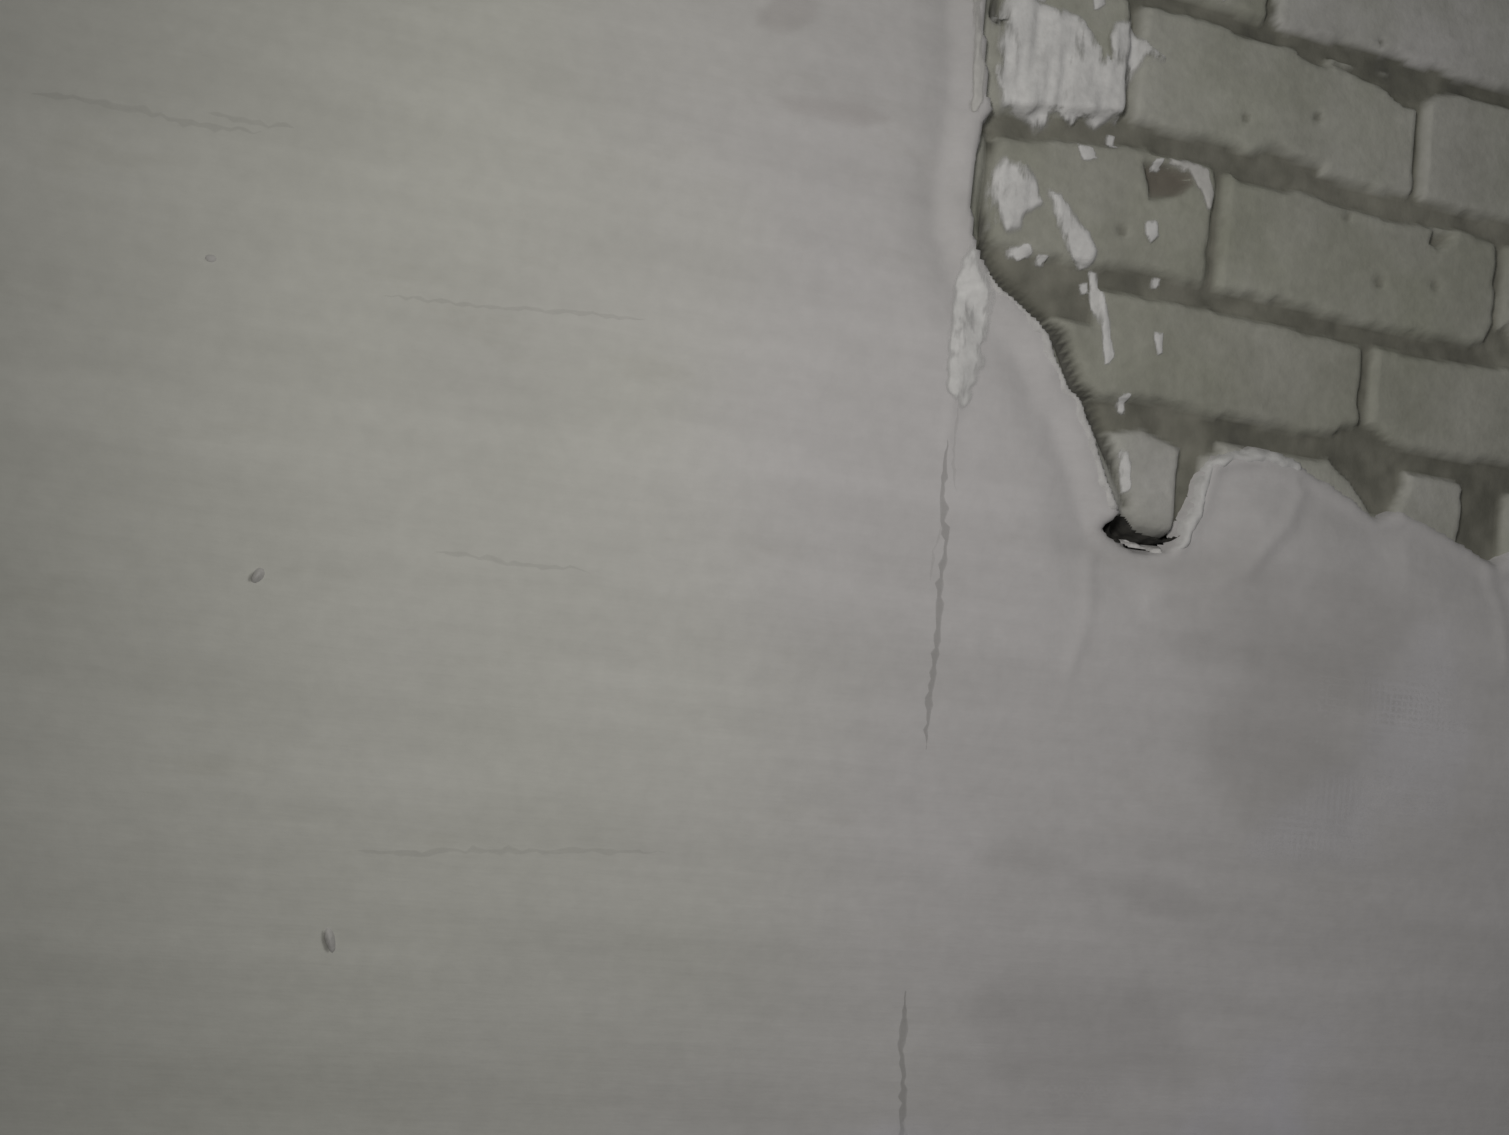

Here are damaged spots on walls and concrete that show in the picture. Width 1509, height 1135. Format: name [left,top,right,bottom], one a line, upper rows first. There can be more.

flaking render [970,0,1509,560]